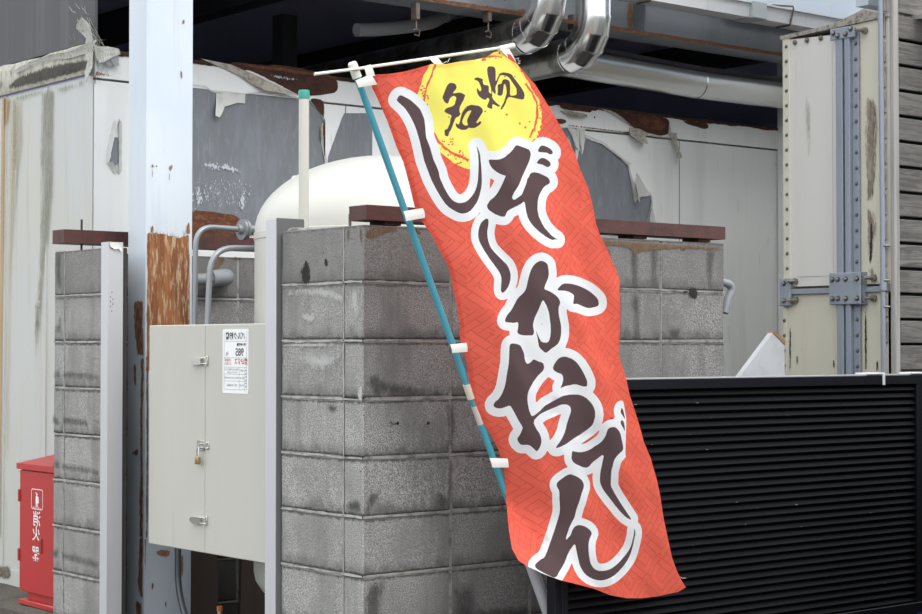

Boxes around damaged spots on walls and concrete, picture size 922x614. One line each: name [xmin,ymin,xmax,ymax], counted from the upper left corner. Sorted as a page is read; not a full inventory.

leakage [9,60,87,89]
peeling [106,118,122,175]
peeling [192,84,372,237]
peeling [560,126,656,223]
rust [546,101,778,159]
rust [0,97,9,448]
rust [132,211,240,614]